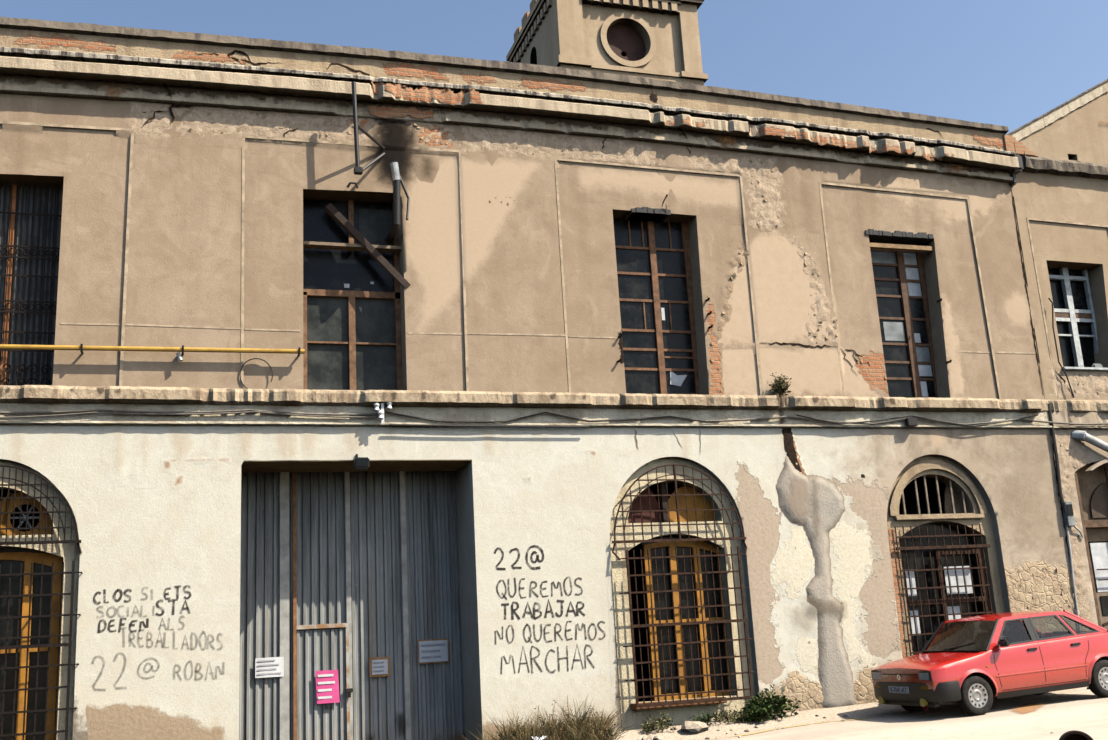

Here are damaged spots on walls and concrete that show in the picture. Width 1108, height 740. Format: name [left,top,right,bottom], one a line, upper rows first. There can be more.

flaking render [171,50,246,64]
spalling [116,62,666,171]
water stain [0,73,995,246]
spalling [682,146,845,395]
flaking render [855,346,889,397]
peeling [724,452,824,712]
water stain [783,599,818,639]
peeling [823,464,908,705]
spalling [1003,429,1098,633]